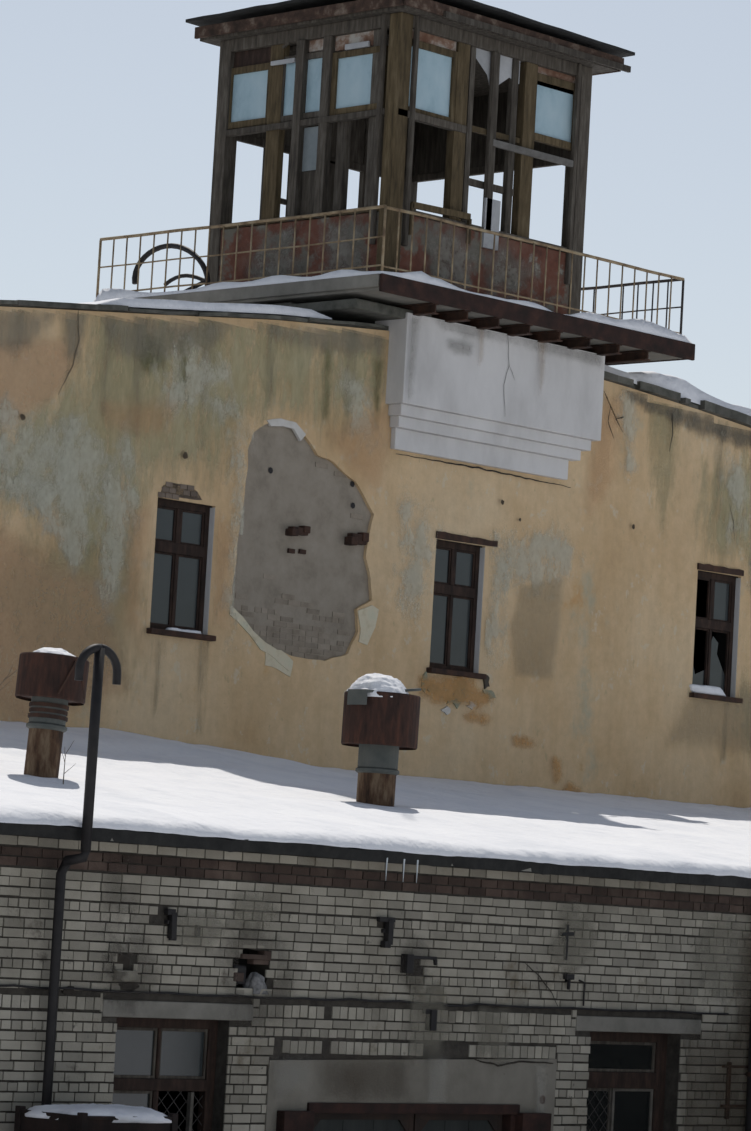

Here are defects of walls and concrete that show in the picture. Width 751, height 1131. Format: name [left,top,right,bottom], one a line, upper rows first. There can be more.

crack [58,309,80,395]
leakage [0,402,138,598]
spalling [158,482,202,500]
flaking render [229,418,379,677]
peeling [482,675,496,699]
spalling [232,951,271,995]